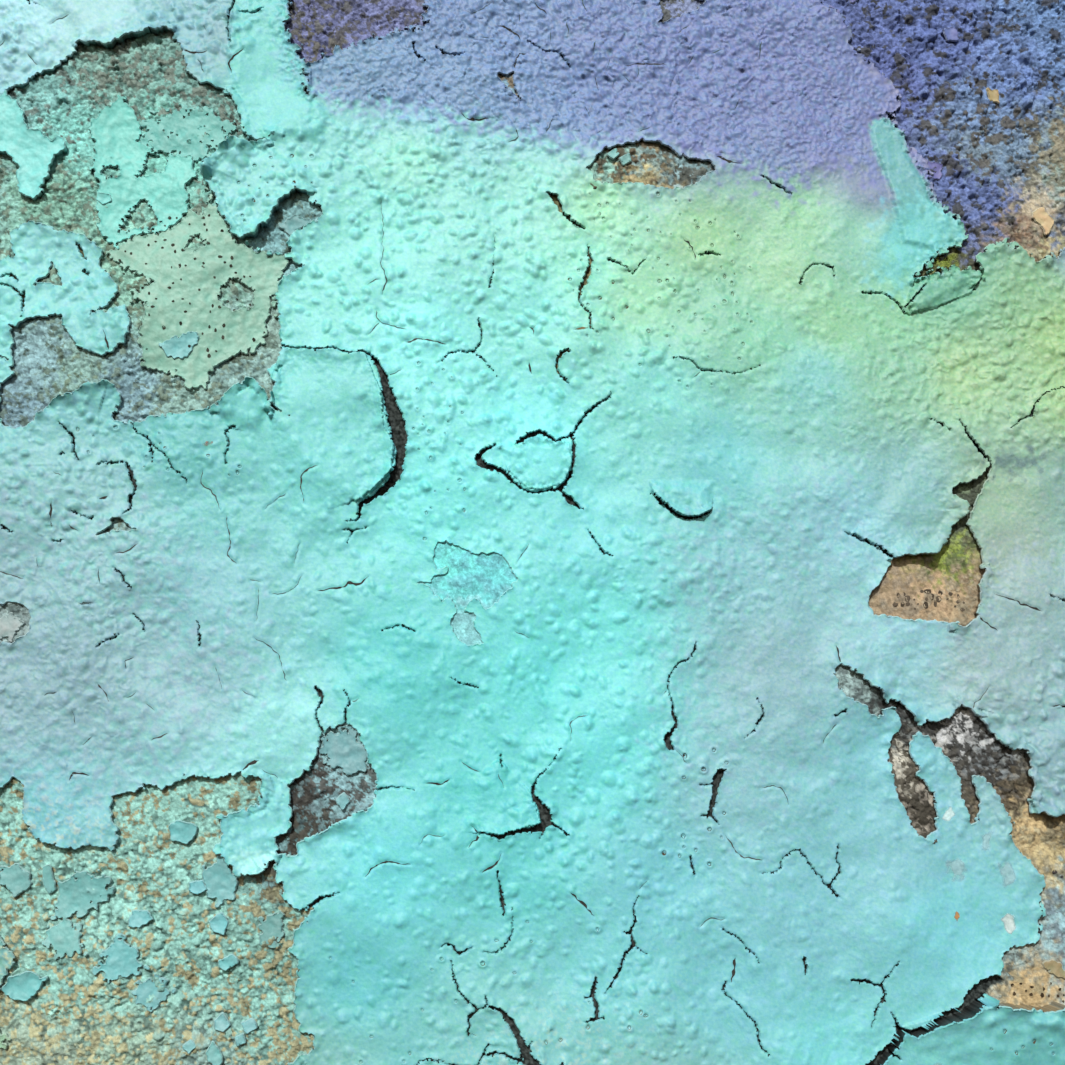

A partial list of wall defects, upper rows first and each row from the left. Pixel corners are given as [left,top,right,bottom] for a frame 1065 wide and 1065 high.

peeling [0,26,323,437]
crack [280,200,498,543]
crack [474,391,613,557]
crack [528,191,646,385]
peeling [586,138,716,189]
peeling [868,461,992,627]
peeling [821,0,1065,278]
peeling [0,723,378,1065]
crack [416,715,588,1065]
crack [584,882,647,1024]
crack [699,768,842,898]
peeling [833,663,1065,1014]